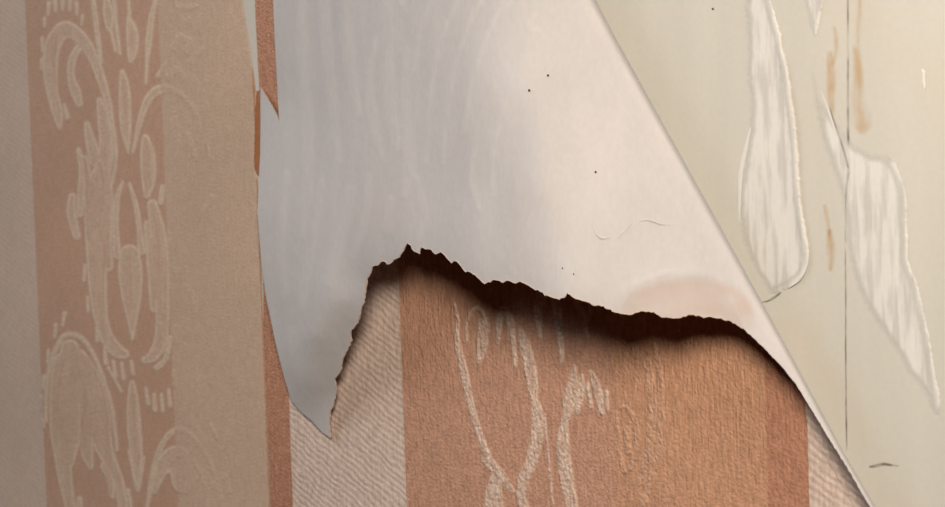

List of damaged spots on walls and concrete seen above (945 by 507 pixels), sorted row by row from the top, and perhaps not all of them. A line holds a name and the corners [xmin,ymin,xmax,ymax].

peeling [738,0,809,293]
peeling [820,91,941,412]